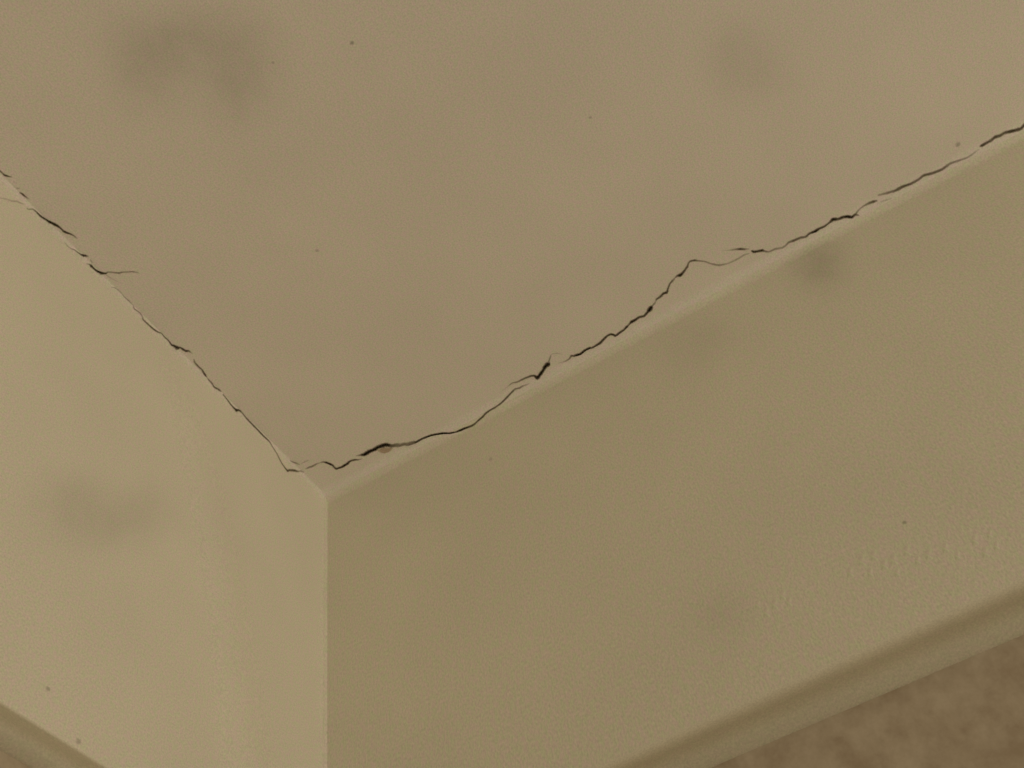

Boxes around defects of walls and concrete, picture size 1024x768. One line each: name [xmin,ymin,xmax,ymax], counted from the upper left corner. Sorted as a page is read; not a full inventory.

crack [980,125,1024,147]
crack [0,171,122,274]
crack [737,161,956,253]
crack [143,319,269,441]
crack [282,260,698,472]